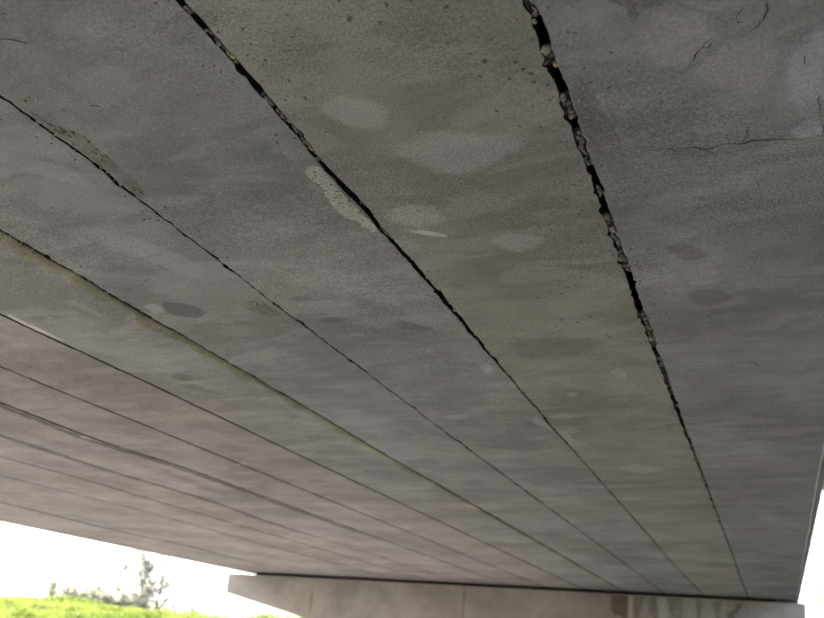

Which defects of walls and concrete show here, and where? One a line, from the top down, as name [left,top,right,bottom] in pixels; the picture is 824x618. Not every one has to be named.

crack [734,2,769,36]
crack [656,98,824,154]
efflorescence [300,159,384,236]
crack [512,0,749,598]
crack [0,95,665,617]
damp [610,596,744,618]